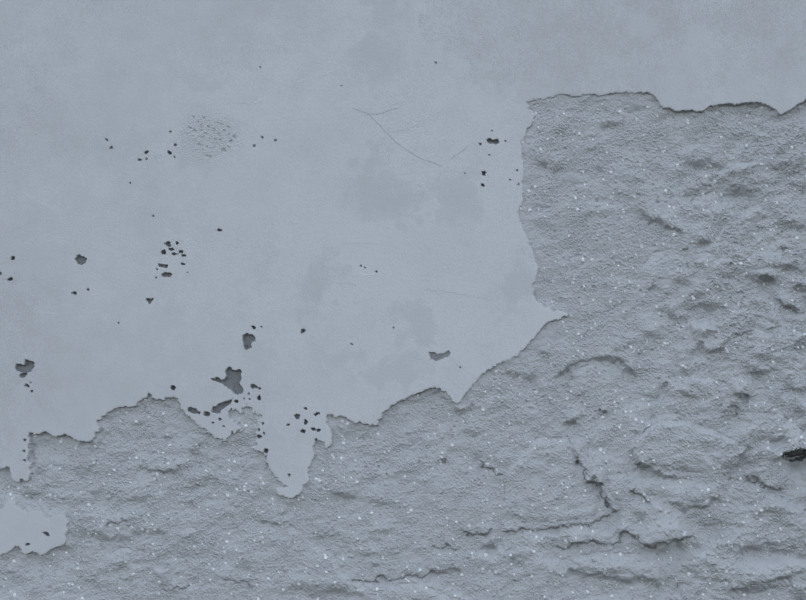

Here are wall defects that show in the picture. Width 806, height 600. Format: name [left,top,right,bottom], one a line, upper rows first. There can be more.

crack [353,108,470,167]
hole [156,241,189,279]
spalling [695,241,761,281]
spalling [740,289,785,332]
spalling [747,327,806,365]
hole [15,360,35,393]
spalling [211,367,251,400]
spalling [656,374,729,416]
spalling [751,412,802,444]
spalling [780,462,806,495]
spalling [484,545,550,582]
spalling [677,584,736,600]